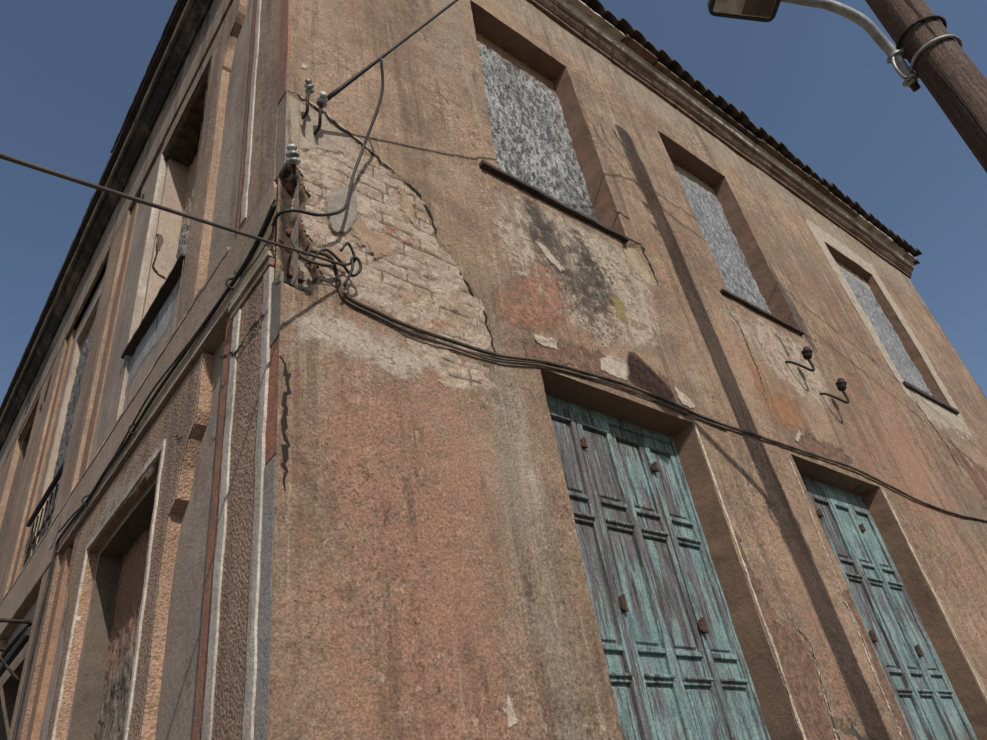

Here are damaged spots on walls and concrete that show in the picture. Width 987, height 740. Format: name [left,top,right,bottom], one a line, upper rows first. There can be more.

crack [152,234,165,278]
flaking render [278,94,695,408]
leakage [497,189,665,348]
crack [280,355,303,491]